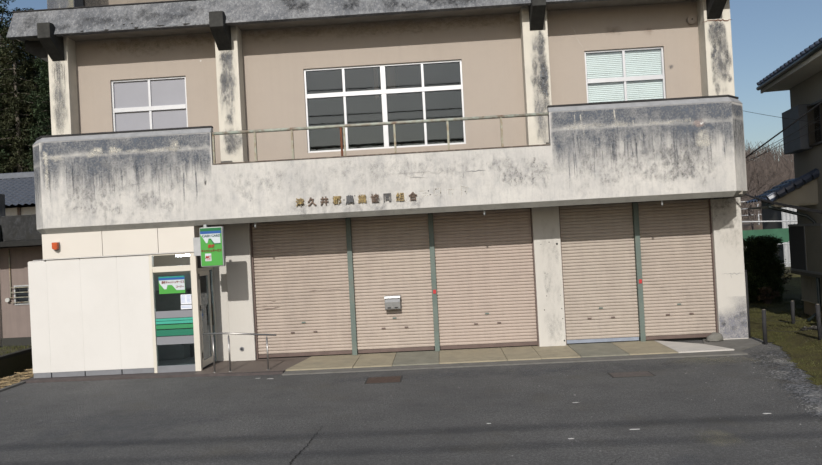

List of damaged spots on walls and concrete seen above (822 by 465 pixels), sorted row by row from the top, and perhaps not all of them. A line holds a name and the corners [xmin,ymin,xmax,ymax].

leakage [709,23,732,81]
leakage [533,33,743,154]
leakage [33,133,210,187]